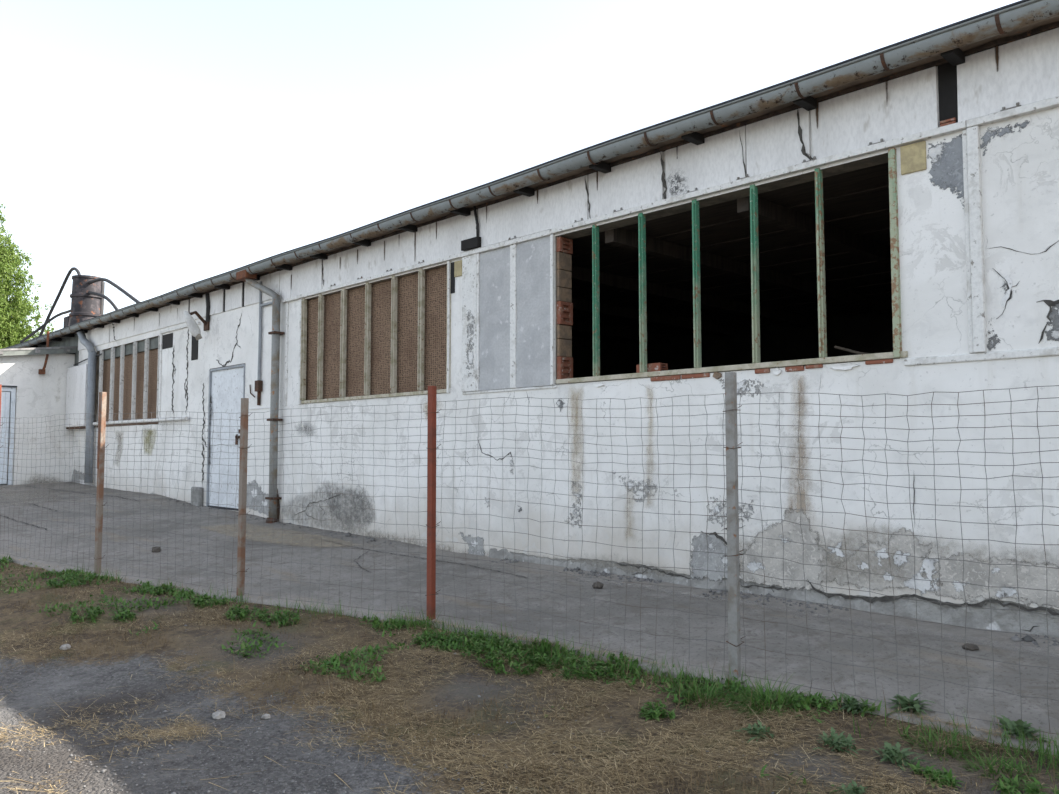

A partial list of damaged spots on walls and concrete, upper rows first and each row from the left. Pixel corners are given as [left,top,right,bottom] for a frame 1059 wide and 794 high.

crack [797,110,813,160]
flaking render [927,134,964,209]
flaking render [980,120,1030,156]
crack [986,240,1058,318]
crack [1038,300,1059,344]
flaking render [1045,304,1059,341]
crack [172,313,242,480]
water stain [791,381,806,513]
peeling [613,473,657,502]
flaking render [690,496,754,583]
crack [705,525,1059,632]
flaking render [740,508,1059,608]